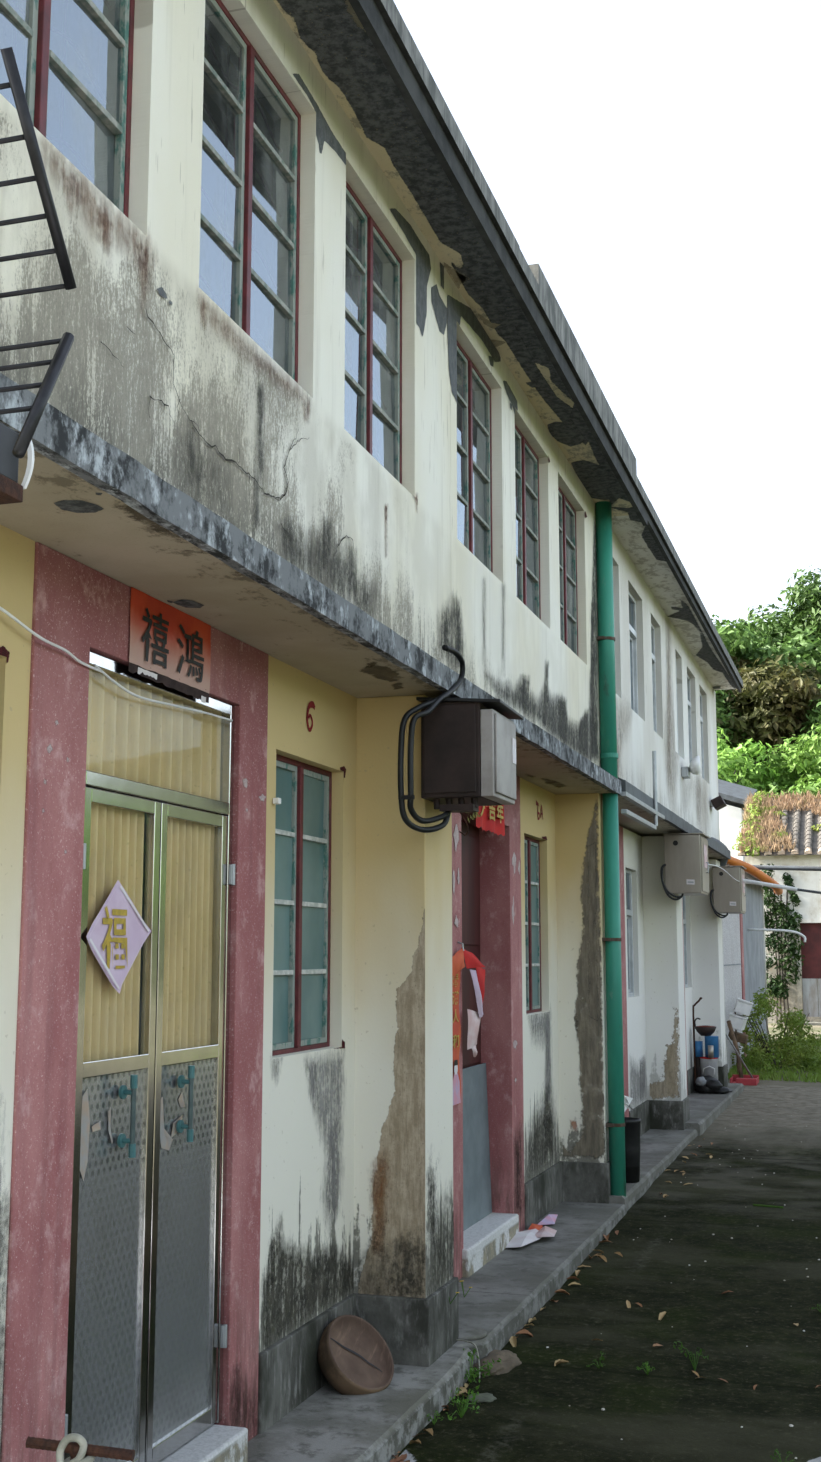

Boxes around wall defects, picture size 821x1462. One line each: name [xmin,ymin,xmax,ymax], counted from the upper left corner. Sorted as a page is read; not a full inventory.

crack [101,310,309,543]
peeling [277,0,666,561]
damp [494,523,598,759]
damp [263,909,454,1347]
damp [515,802,605,1211]